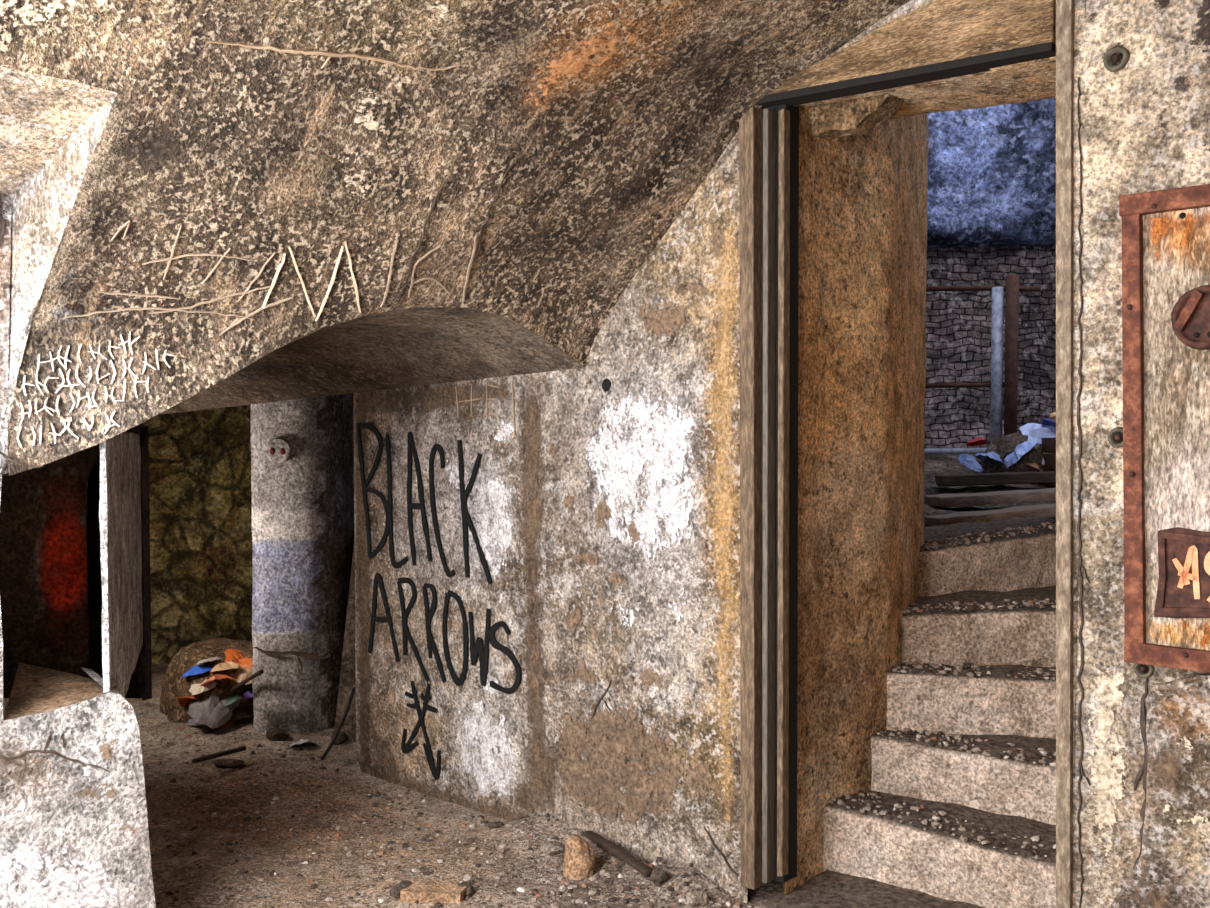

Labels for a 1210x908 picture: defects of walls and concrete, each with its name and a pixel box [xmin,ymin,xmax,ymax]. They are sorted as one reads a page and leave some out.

rust [1149,212,1210,260]
rust [1200,624,1210,650]
flaking render [1086,669,1127,860]
flaking render [1095,673,1210,908]